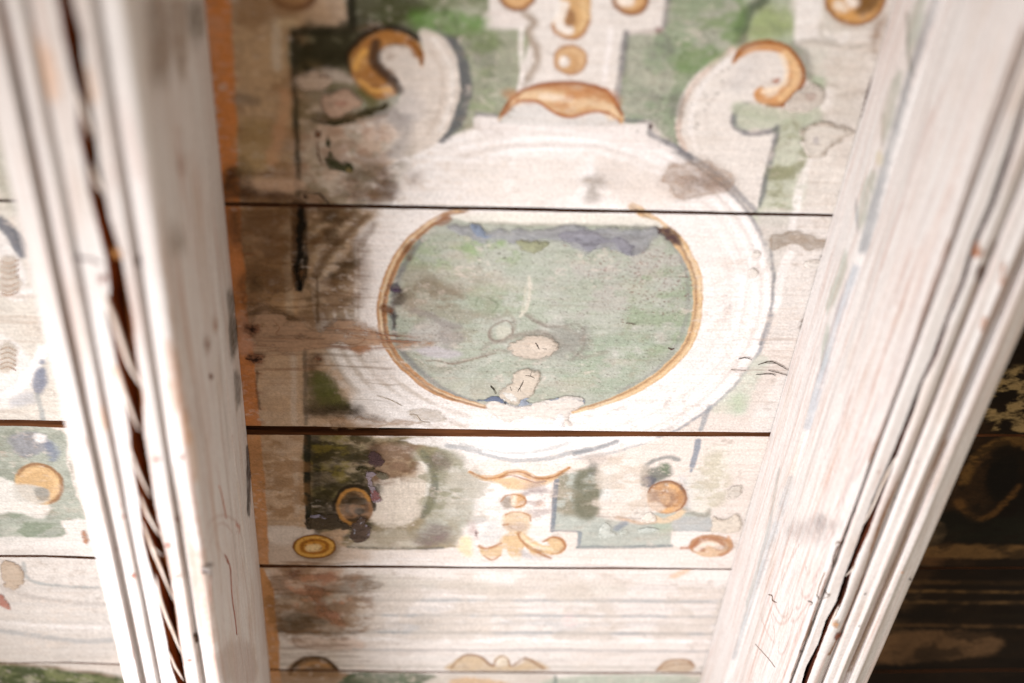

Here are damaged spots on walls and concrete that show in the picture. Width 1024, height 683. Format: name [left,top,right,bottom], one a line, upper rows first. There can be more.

water stain [228,206,305,354]
water stain [390,286,403,328]
peeling [477,335,585,428]
crack [802,100,1024,683]